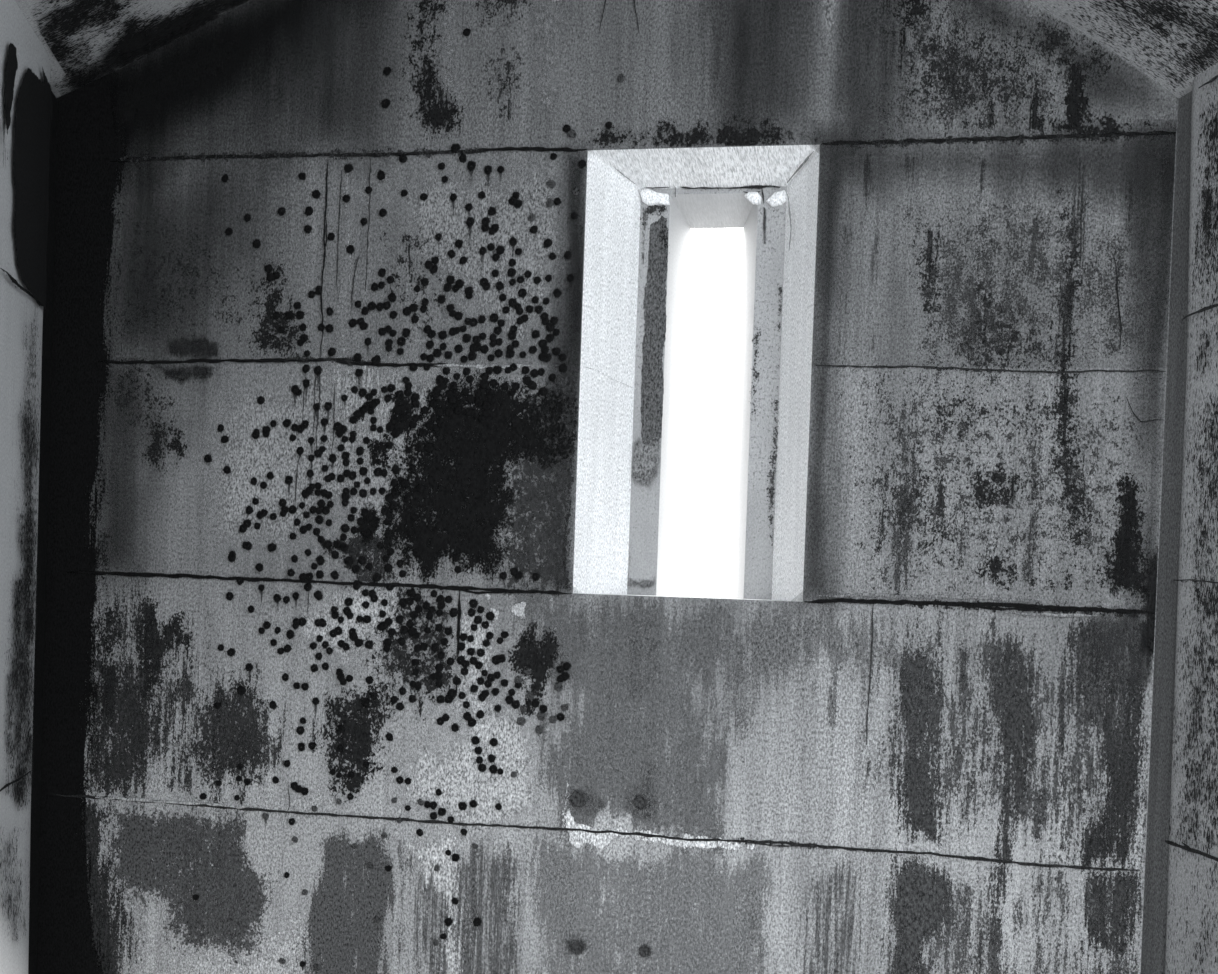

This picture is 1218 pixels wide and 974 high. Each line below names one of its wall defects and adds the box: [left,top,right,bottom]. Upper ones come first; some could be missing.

damp [383,0,505,199]
damp [562,0,822,148]
damp [448,203,499,265]
damp [1162,87,1218,974]
damp [258,549,325,655]
damp [437,713,459,732]
damp [471,736,517,778]
damp [285,782,309,825]
damp [417,789,454,823]
damp [458,800,478,810]
crack [1165,840,1218,861]
damp [794,857,869,974]